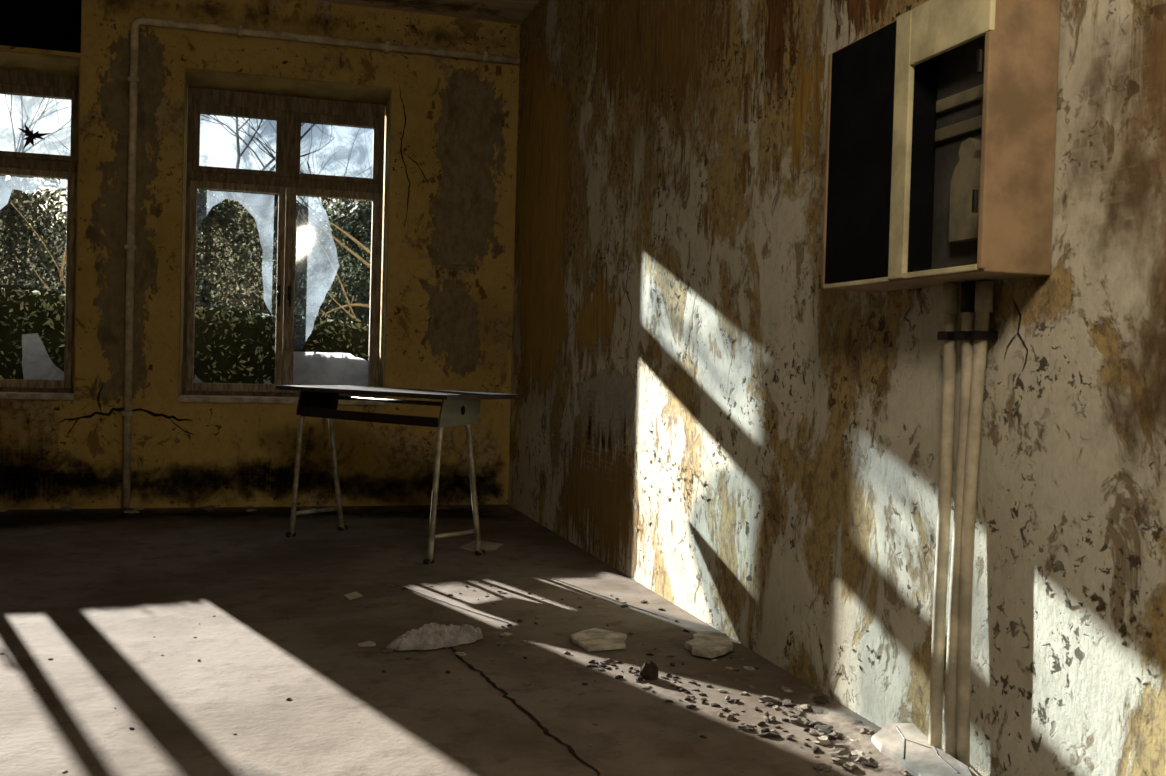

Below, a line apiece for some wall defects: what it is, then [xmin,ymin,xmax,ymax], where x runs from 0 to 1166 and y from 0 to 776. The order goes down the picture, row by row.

peeling [740,0,887,188]
peeling [86,24,171,407]
damp [1091,0,1166,434]
peeling [567,263,621,379]
crack [59,383,195,435]
peeling [554,401,707,574]
crack [449,647,600,776]
flaking render [819,627,877,678]
flaking render [1064,561,1159,647]